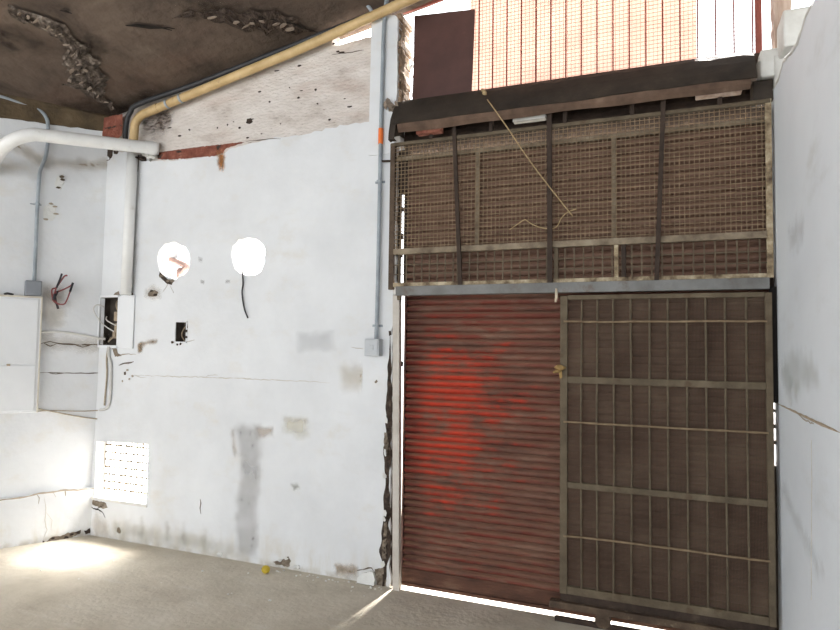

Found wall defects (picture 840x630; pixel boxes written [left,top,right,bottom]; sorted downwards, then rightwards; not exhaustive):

flaking render [8,4,371,172]
flaking render [159,243,182,285]
flaking render [92,442,107,509]
flaking render [357,331,393,586]
crack [777,403,840,600]